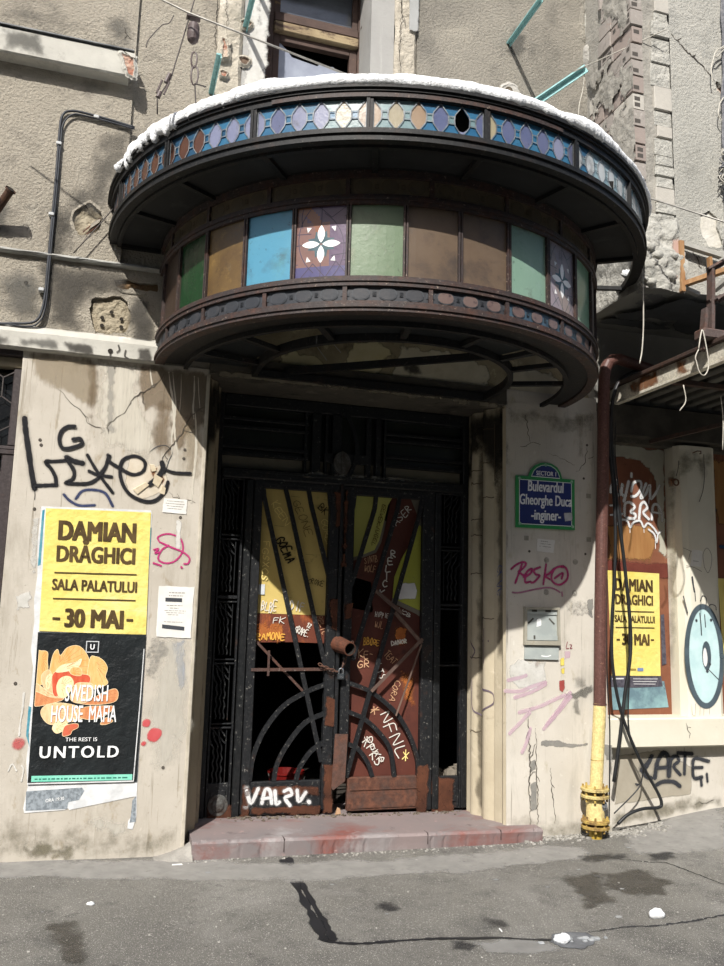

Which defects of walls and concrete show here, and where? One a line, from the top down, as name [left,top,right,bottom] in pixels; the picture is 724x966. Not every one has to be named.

crack [397,0,405,73]
flaking render [587,0,688,330]
leakage [45,264,124,325]
crack [61,378,162,433]
crack [151,407,205,464]
rust [630,372,658,392]
leakage [22,298,215,642]
leakage [147,641,185,688]
crack [526,711,556,820]